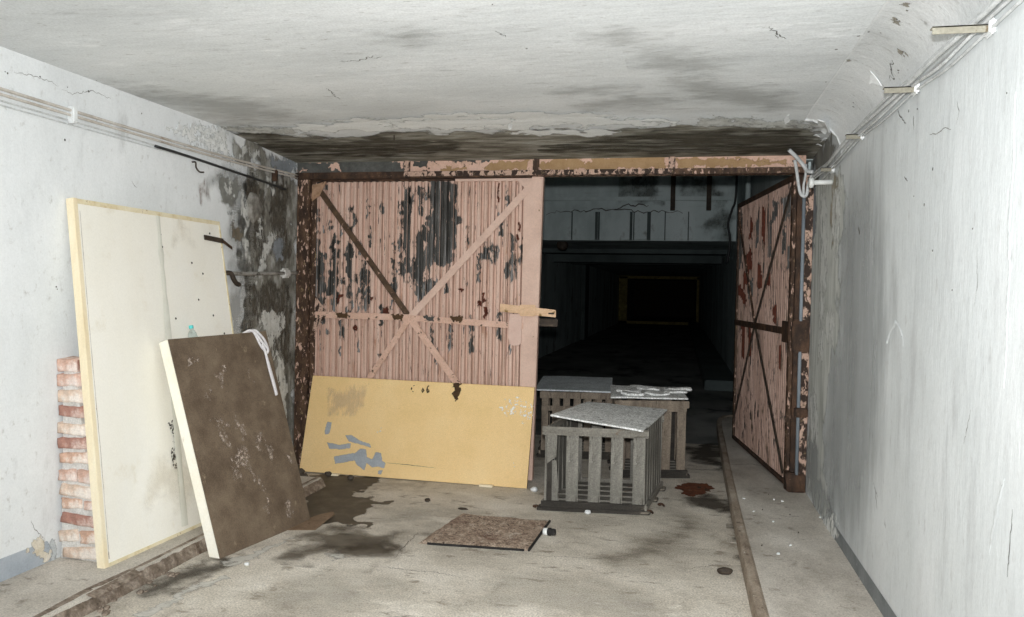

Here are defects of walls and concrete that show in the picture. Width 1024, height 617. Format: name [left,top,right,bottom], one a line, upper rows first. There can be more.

peeling [166,111,679,167]
peeling [695,115,831,146]
leakage [219,124,835,448]
spalling [33,533,208,617]
leakage [143,474,401,597]